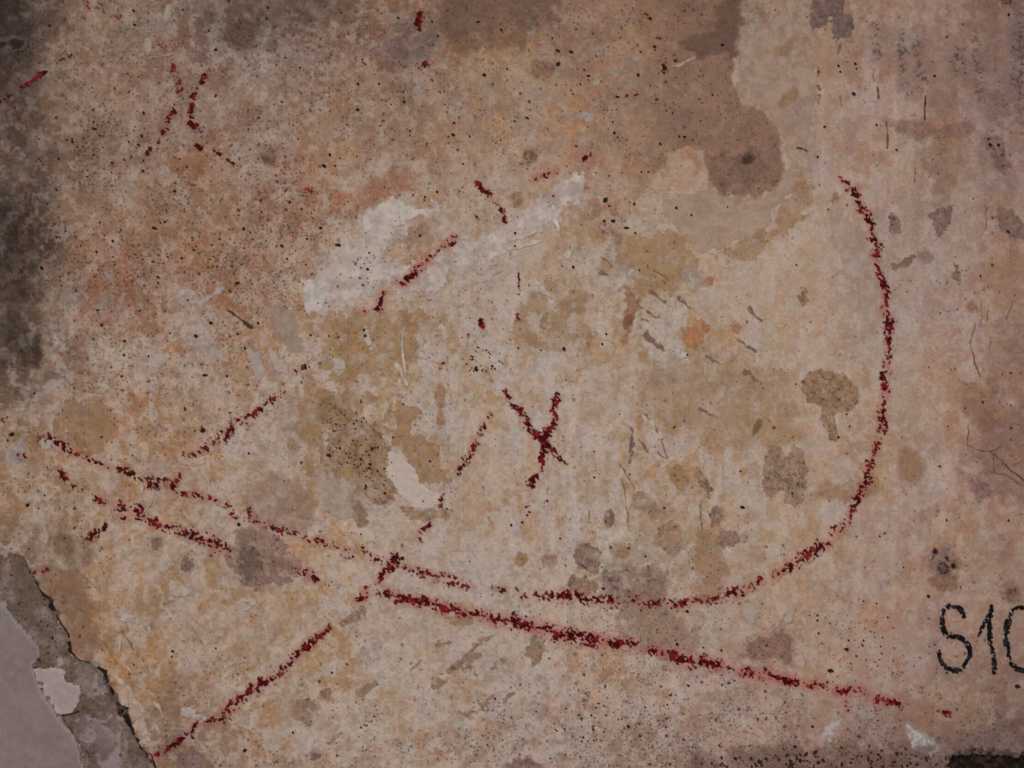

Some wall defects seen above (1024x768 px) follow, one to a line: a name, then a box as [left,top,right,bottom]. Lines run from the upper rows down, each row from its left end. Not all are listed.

flaking render [0,552,155,768]